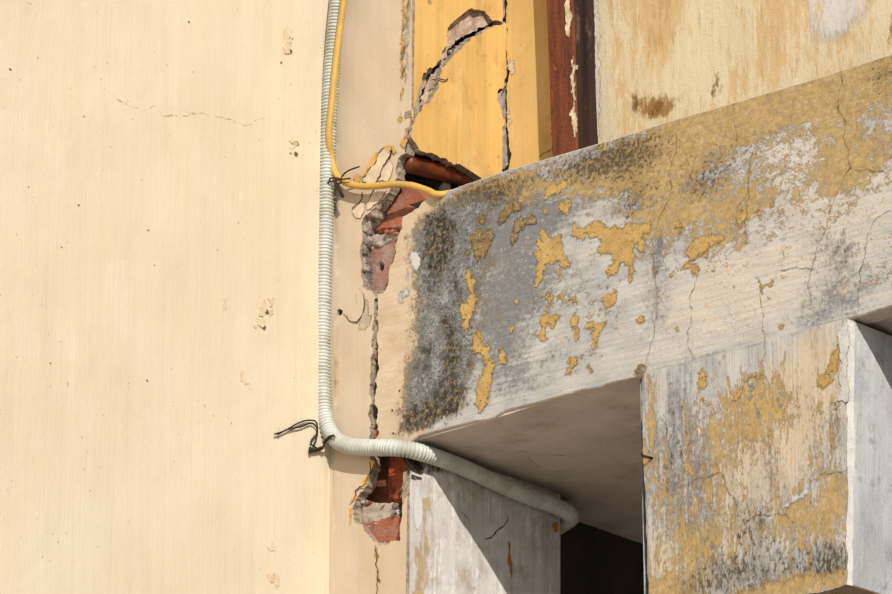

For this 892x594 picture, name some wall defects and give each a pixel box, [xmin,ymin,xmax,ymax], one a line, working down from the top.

crack [432,42,465,80]
crack [497,84,511,170]
peeling [564,0,573,37]
peeling [569,56,578,137]
peeling [594,0,602,137]
peeling [802,0,871,44]
crack [755,70,889,358]
crack [372,290,384,360]
damp [397,190,495,433]
peeling [459,180,652,413]
peeling [817,323,850,403]
flaking render [349,456,423,546]